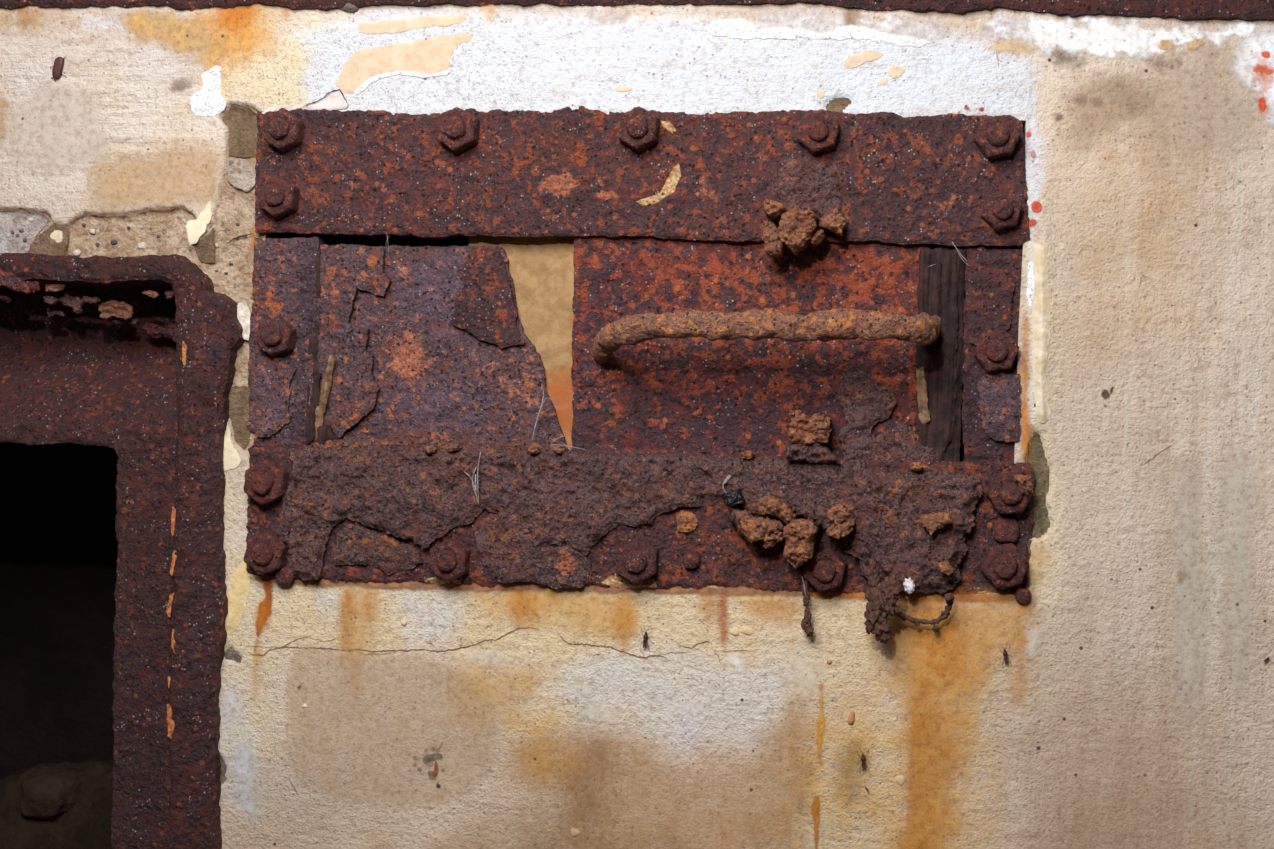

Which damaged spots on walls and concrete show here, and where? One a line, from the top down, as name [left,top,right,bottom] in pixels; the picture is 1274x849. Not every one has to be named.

rust [124,5,255,63]
spalling [0,15,472,471]
rust [1029,201,1042,226]
rust [0,267,177,341]
rust [1022,399,1031,460]
rust [992,517,1020,543]
rust [254,566,865,641]
crack [248,627,754,664]
rust [817,684,825,764]
rust [891,588,1031,849]
rust [811,797,820,849]